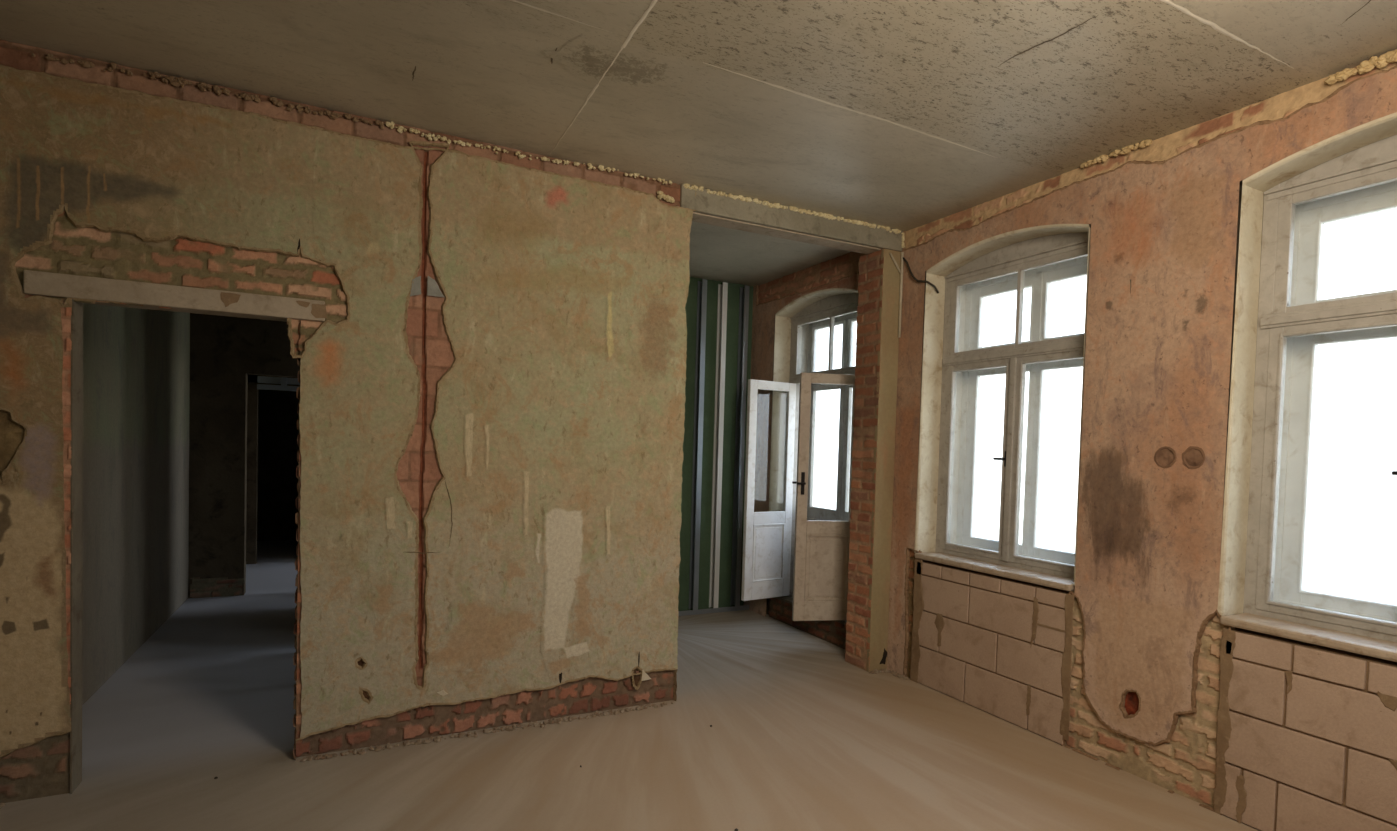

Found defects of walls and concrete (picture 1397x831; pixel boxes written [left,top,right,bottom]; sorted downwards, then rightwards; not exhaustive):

spalling [902,62,1397,251]
spalling [0,729,71,803]
spalling [0,39,696,757]
flaking render [756,248,887,671]
spalling [903,548,922,678]
water stain [1086,500,1157,596]
spalling [1061,591,1235,815]
spalling [1154,446,1205,469]